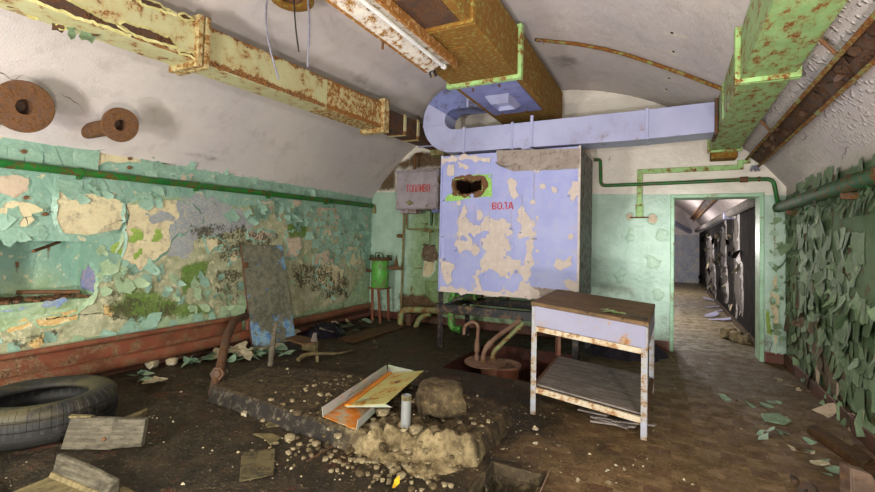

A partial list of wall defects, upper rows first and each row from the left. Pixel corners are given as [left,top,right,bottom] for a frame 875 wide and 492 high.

corrosion [28,0,195,60]
flaking render [0,141,373,354]
flaking render [698,213,744,319]
peeling [768,154,875,437]
peeling [761,413,792,425]